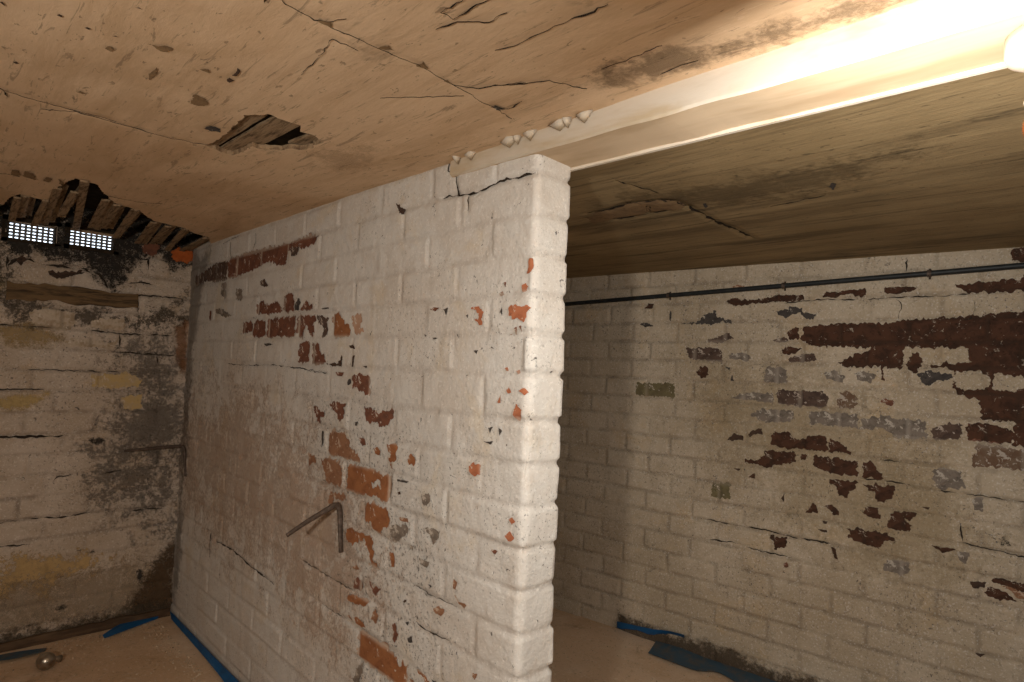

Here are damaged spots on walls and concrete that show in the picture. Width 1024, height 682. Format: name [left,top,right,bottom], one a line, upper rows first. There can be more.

crack [282,0,698,119]
spalling [204,114,323,155]
flaking render [0,170,211,264]
crack [443,165,536,208]
crack [589,180,754,238]
peeling [195,232,319,321]
flaking render [955,247,1024,294]
flaking render [669,310,751,381]
flaking render [726,285,1024,550]
peeling [243,293,436,682]
water stain [0,543,175,643]
peeling [970,578,1024,602]